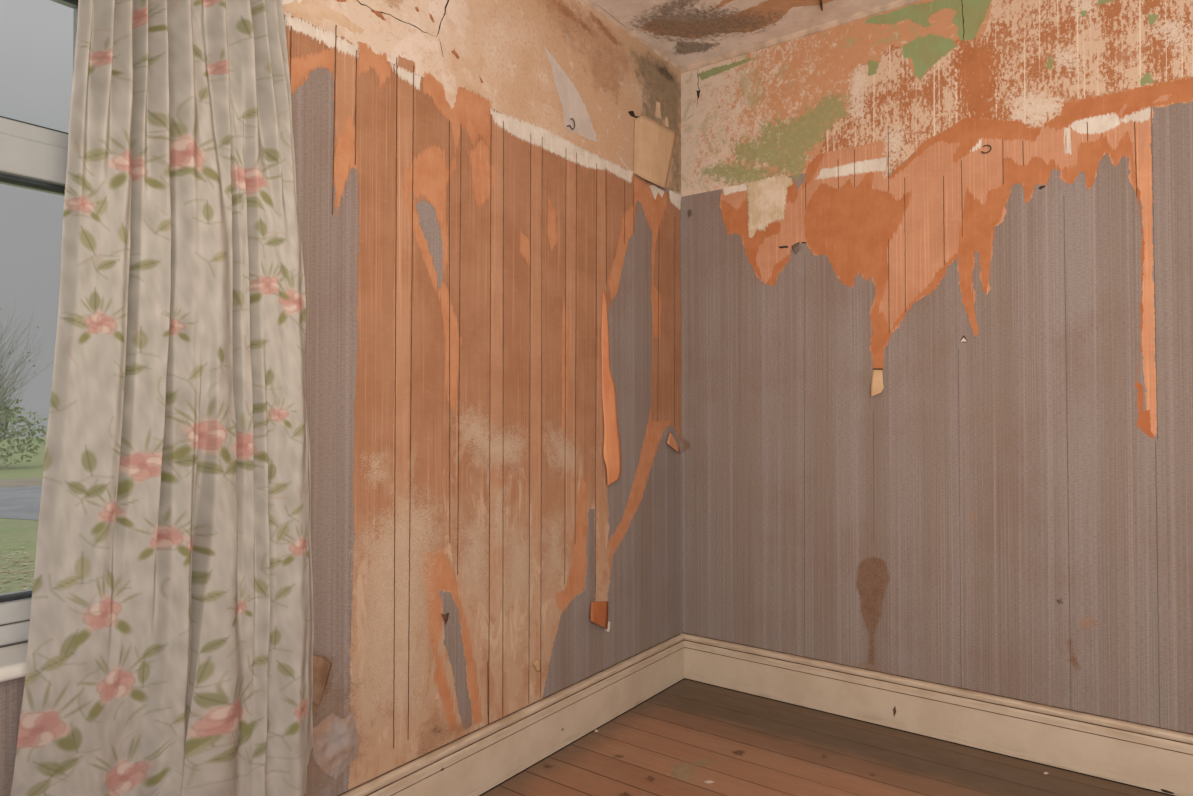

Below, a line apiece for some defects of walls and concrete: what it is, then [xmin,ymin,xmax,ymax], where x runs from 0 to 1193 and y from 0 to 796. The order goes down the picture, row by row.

crack [357,0,449,55]
leakage [625,0,786,192]
peeling [641,0,834,38]
peeling [695,0,1193,238]
peeling [1135,120,1158,438]
peeling [601,288,621,486]
leakage [853,556,890,672]